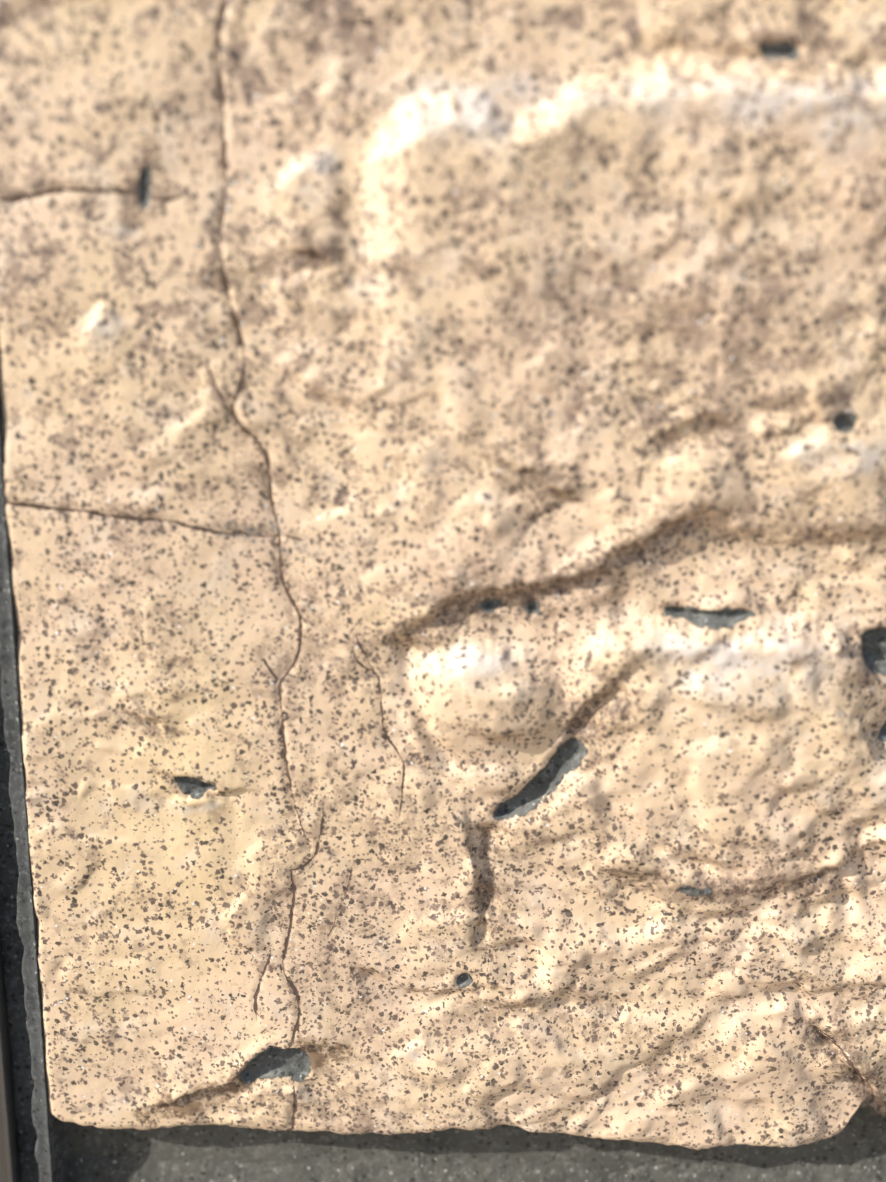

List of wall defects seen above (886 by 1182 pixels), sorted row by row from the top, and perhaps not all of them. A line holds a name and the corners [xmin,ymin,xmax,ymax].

crack [0,0,324,1049]
crack [328,868,352,937]
crack [289,1085,297,1134]